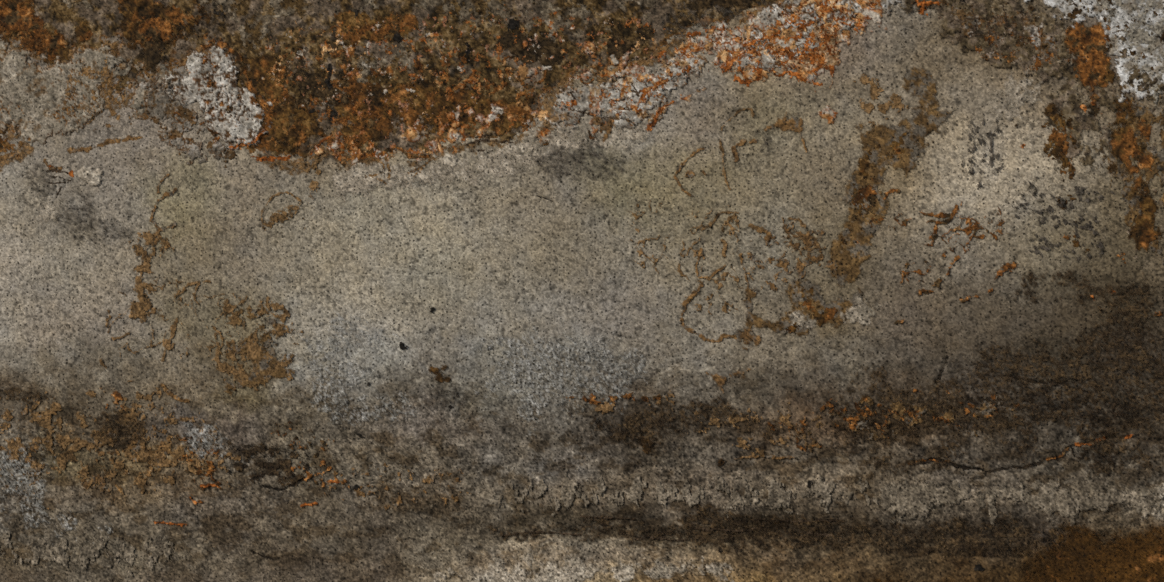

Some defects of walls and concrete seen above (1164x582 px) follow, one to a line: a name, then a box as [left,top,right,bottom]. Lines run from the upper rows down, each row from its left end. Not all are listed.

rust [0,0,882,175]
rust [830,67,1013,296]
damp [995,70,1043,121]
rust [1041,16,1164,265]
rust [960,261,1017,303]
rust [212,296,303,395]
damp [436,327,645,435]
damp [0,448,76,537]
rust [0,380,241,505]
damp [184,422,223,458]
rust [271,420,471,510]